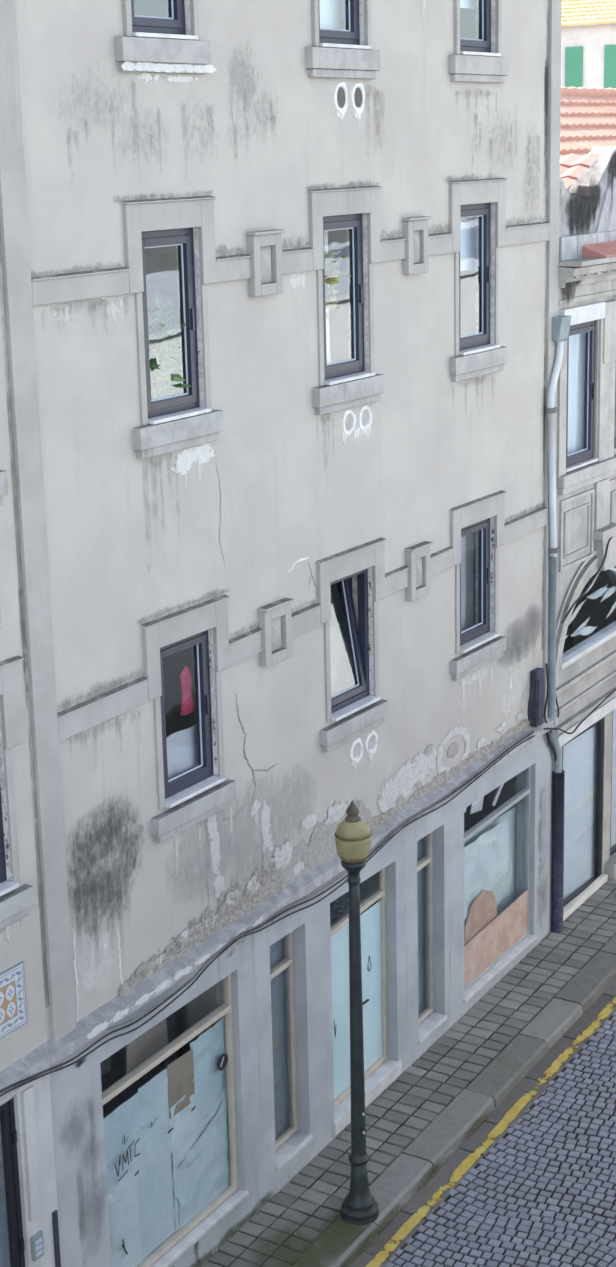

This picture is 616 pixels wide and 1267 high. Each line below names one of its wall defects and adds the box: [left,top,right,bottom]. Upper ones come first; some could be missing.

mould [566,153,616,235]
peeling [169,443,215,476]
crack [199,694,277,906]
damp [70,808,138,916]
spalling [86,711,530,1039]